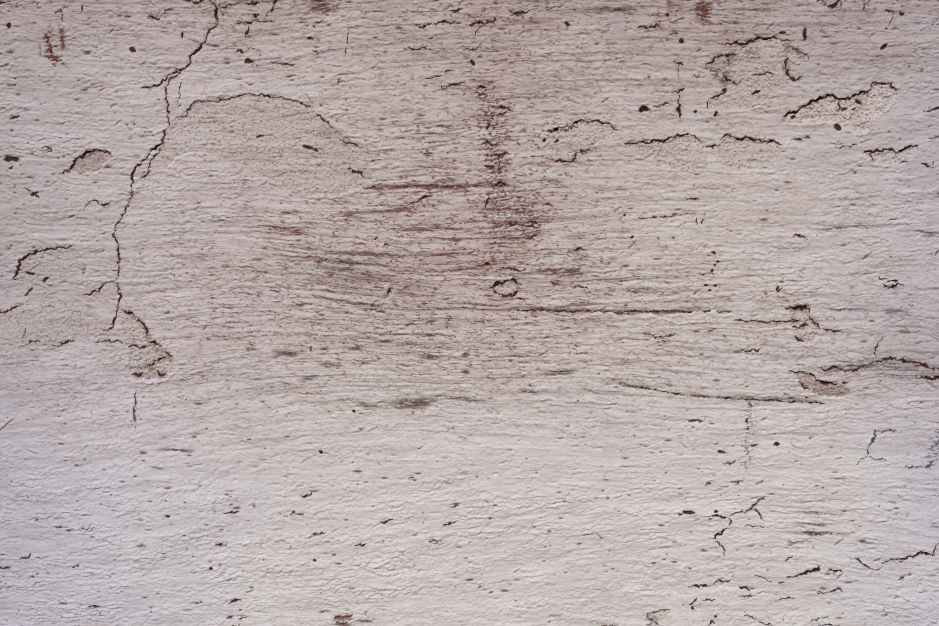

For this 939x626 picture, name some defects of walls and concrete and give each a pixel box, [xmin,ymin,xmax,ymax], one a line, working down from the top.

spalling [60,149,114,177]
crack [84,0,277,331]
spalling [542,119,618,163]
spalling [624,82,934,172]
crack [818,336,939,380]
crack [791,543,939,594]